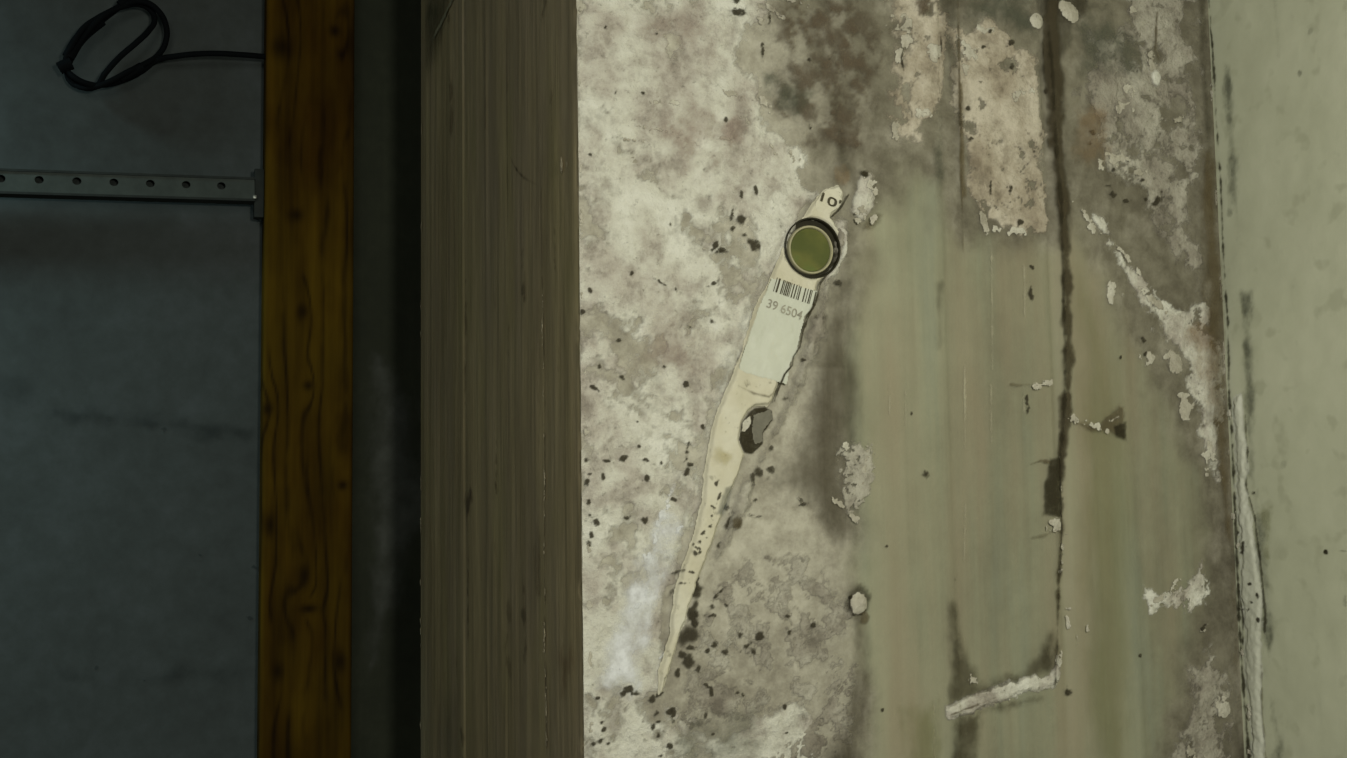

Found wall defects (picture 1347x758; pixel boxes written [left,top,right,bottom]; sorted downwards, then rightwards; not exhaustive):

damp [886,0,1049,236]
damp [1056,0,1086,53]
damp [1075,0,1204,270]
damp [577,0,875,758]
spalling [1074,407,1126,438]
damp [1072,201,1226,482]
damp [956,718,977,758]
damp [951,652,989,698]